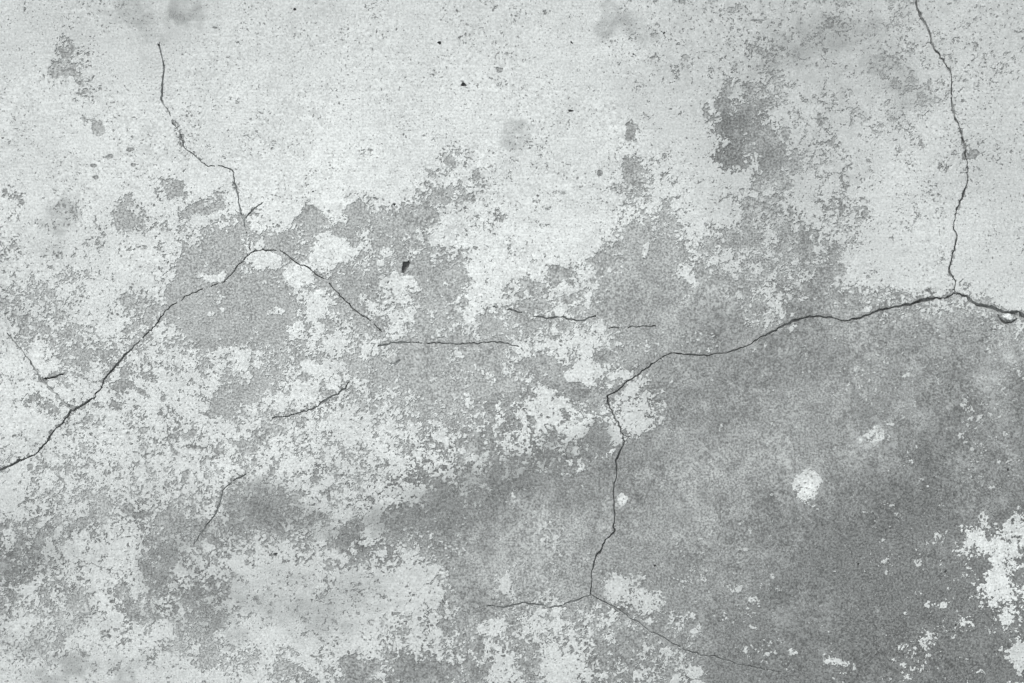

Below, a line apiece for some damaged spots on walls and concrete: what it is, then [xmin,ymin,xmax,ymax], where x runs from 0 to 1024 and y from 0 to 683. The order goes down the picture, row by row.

crack [194,474,246,544]
crack [0,45,519,471]
crack [487,0,1024,672]